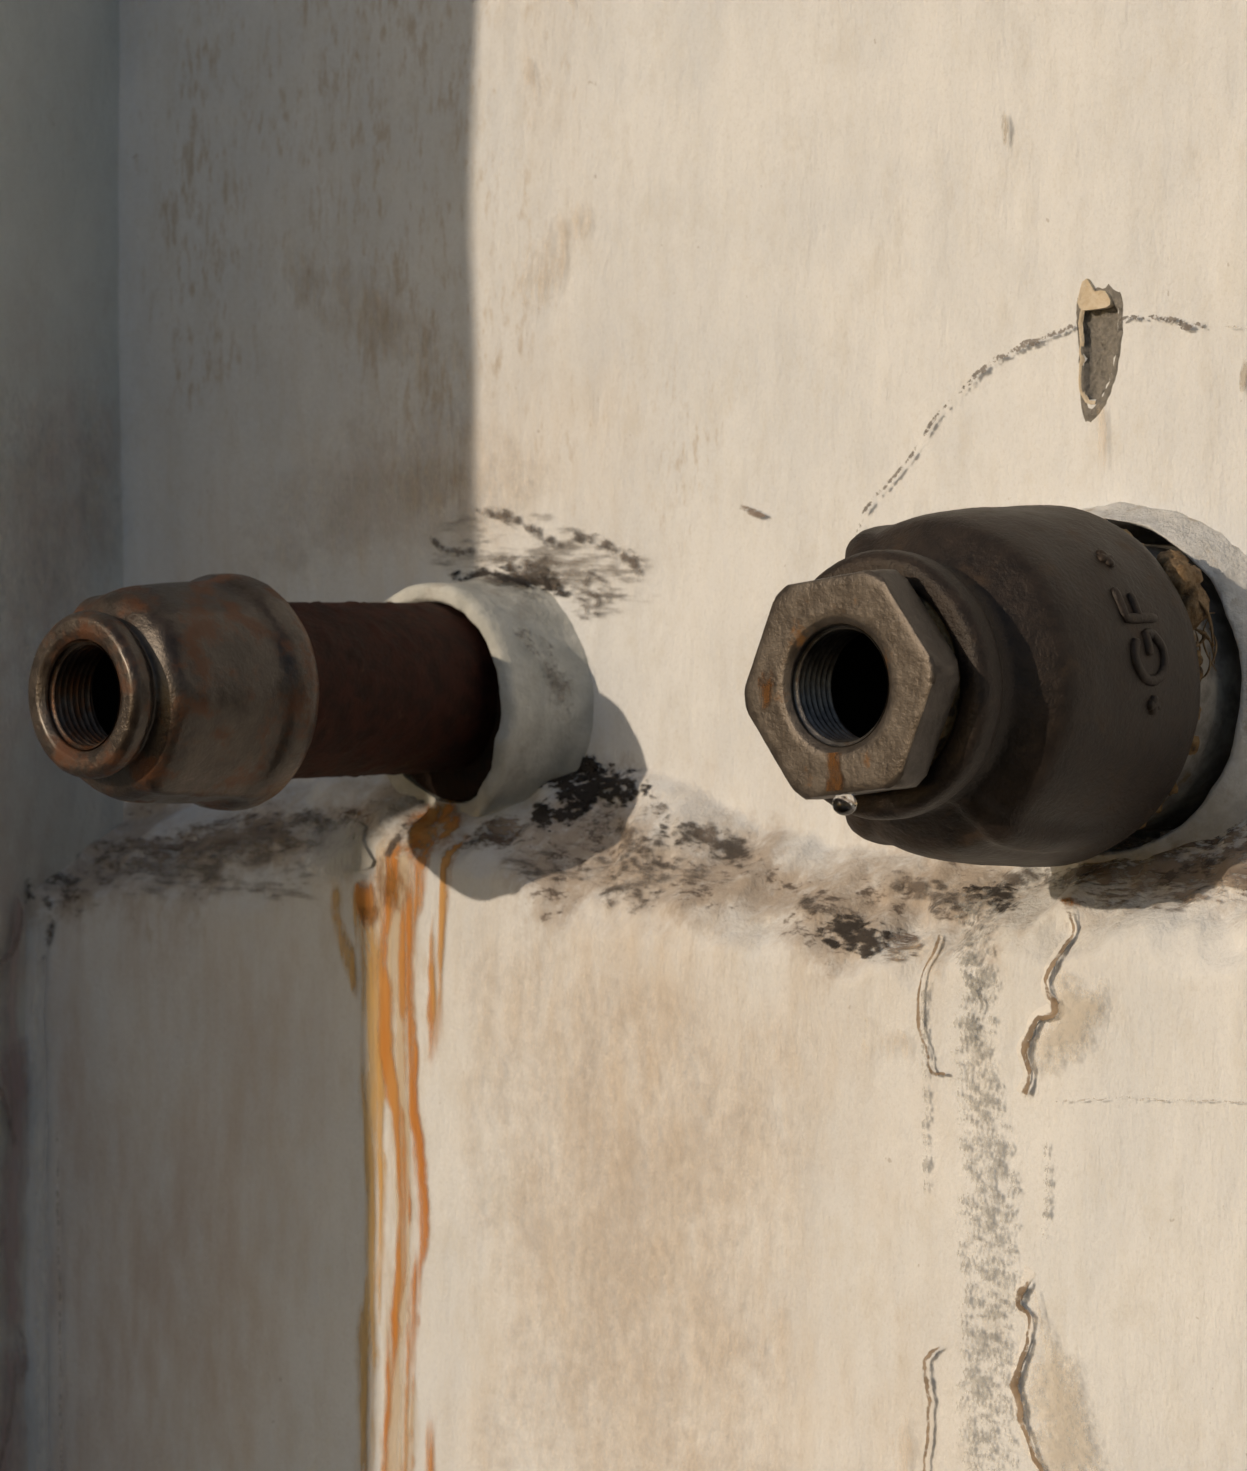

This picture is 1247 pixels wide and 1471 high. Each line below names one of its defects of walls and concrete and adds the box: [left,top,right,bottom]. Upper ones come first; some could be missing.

crack [860,324,1073,526]
spalling [1076,279,1123,422]
crack [1120,315,1236,331]
water stain [431,508,641,619]
water stain [471,756,760,910]
water stain [798,897,922,961]
peeling [916,935,945,1076]
peeling [1016,904,1098,1097]
rust [333,801,468,1471]
water stain [890,830,1230,1471]
peeling [923,1347,938,1471]
peeling [1009,1265,1091,1471]